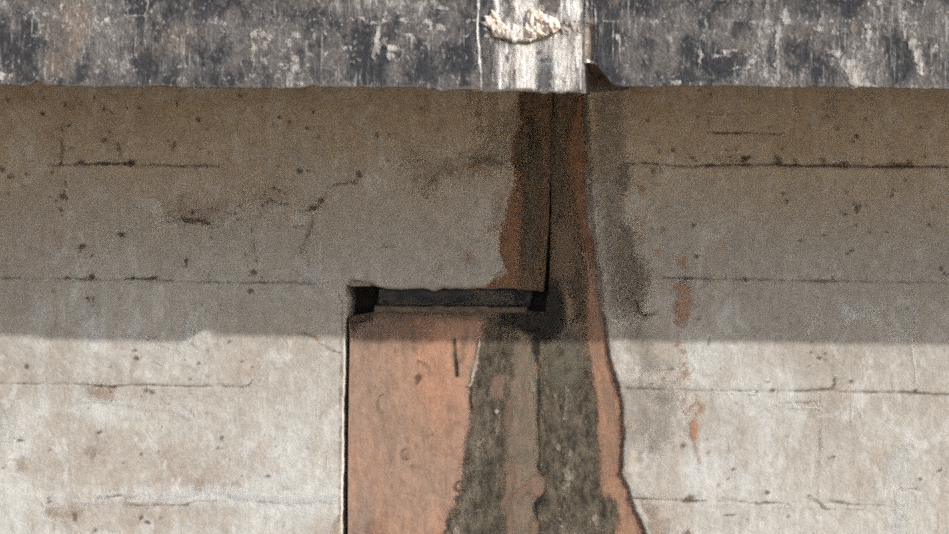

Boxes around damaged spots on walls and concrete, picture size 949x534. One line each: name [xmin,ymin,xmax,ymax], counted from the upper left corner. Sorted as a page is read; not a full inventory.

water stain [0,72,132,86]
water stain [351,11,397,63]
hole [355,286,380,315]
peeling [488,92,552,311]
water stain [400,0,643,534]
peeling [566,95,645,534]